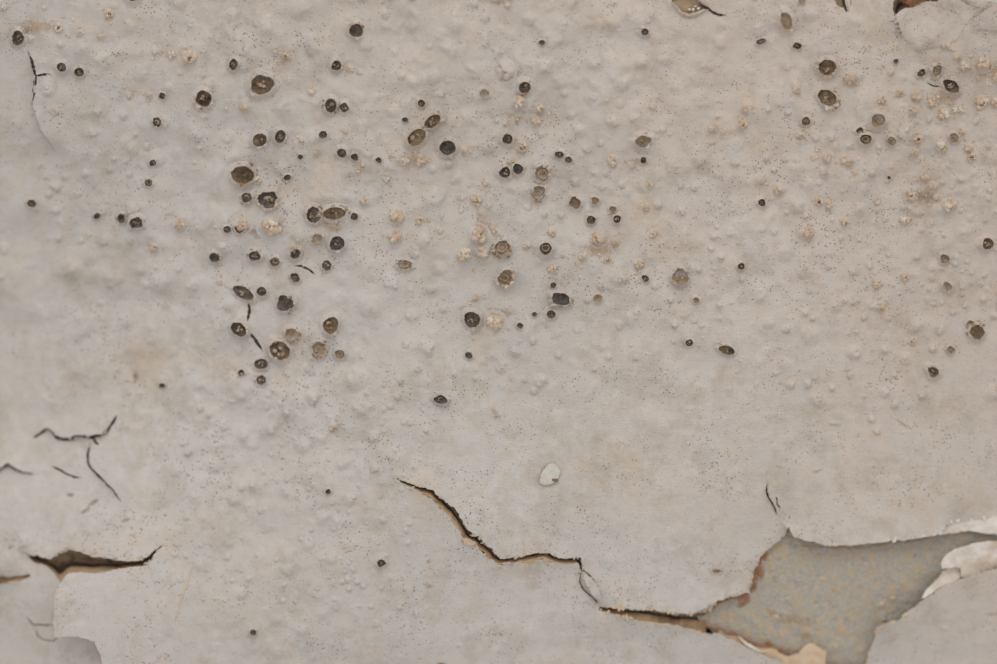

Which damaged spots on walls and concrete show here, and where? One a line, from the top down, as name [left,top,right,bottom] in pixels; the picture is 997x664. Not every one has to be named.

crack [0,543,165,584]
crack [397,478,712,634]
crack [766,483,781,514]
peeling [697,515,997,664]